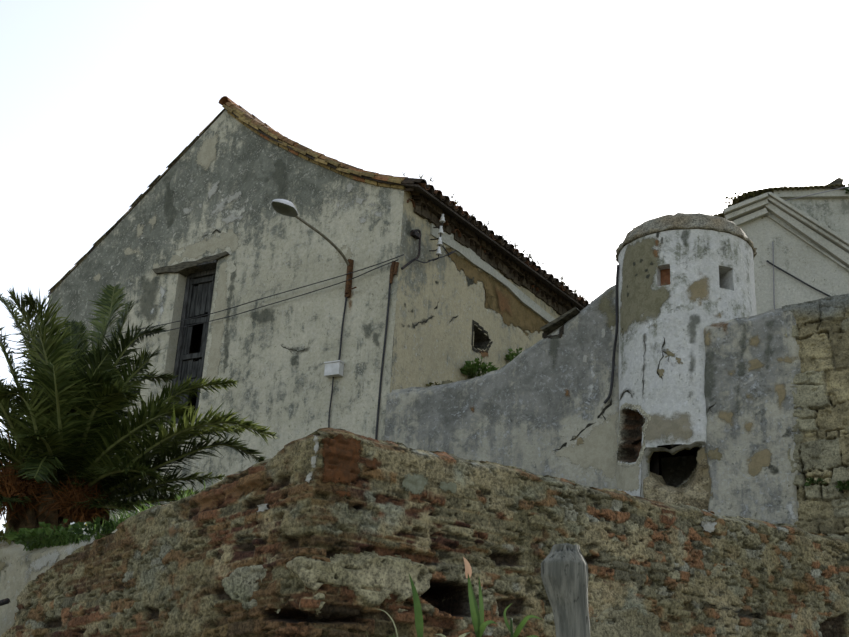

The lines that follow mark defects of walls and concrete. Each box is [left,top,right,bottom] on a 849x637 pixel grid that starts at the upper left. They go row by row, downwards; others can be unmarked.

flaking render [196,126,220,170]
leakage [138,276,165,321]
leakage [223,264,236,374]
leakage [251,310,274,323]
crack [413,299,458,326]
spalling [445,248,565,339]
spalling [599,237,670,338]
spalling [687,277,709,305]
crack [553,334,675,451]
efflorescence [305,435,319,483]
spalling [617,403,652,468]
spalling [747,449,772,477]